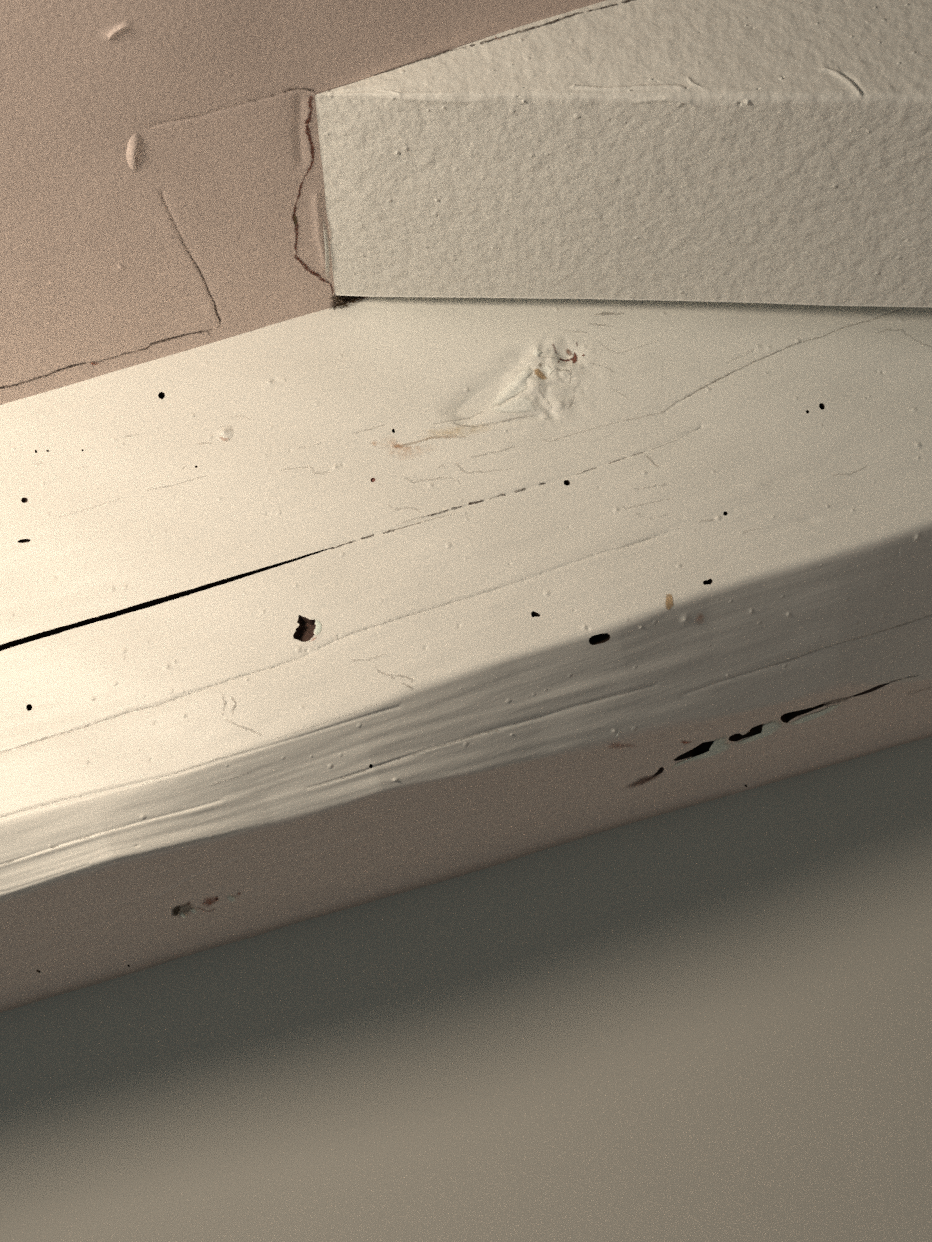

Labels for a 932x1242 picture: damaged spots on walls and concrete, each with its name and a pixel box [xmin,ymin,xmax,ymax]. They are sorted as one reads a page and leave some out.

crack [376,0,631,75]
crack [290,88,333,295]
crack [331,483,544,549]
spalling [293,615,321,642]
spalling [631,681,894,786]